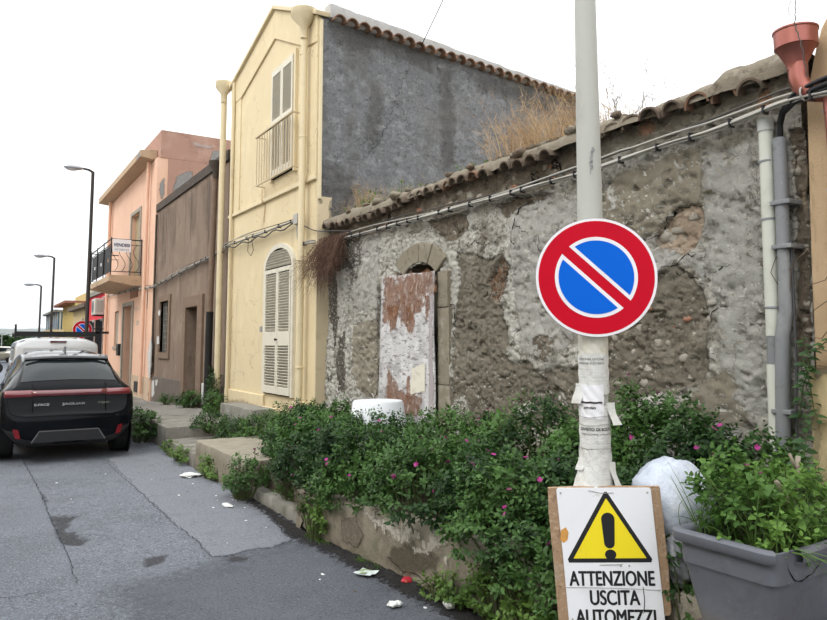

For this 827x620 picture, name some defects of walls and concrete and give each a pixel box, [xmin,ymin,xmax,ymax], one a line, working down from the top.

flaking render [325,137,580,430]
flaking render [602,141,767,416]
peeling [363,508,448,565]